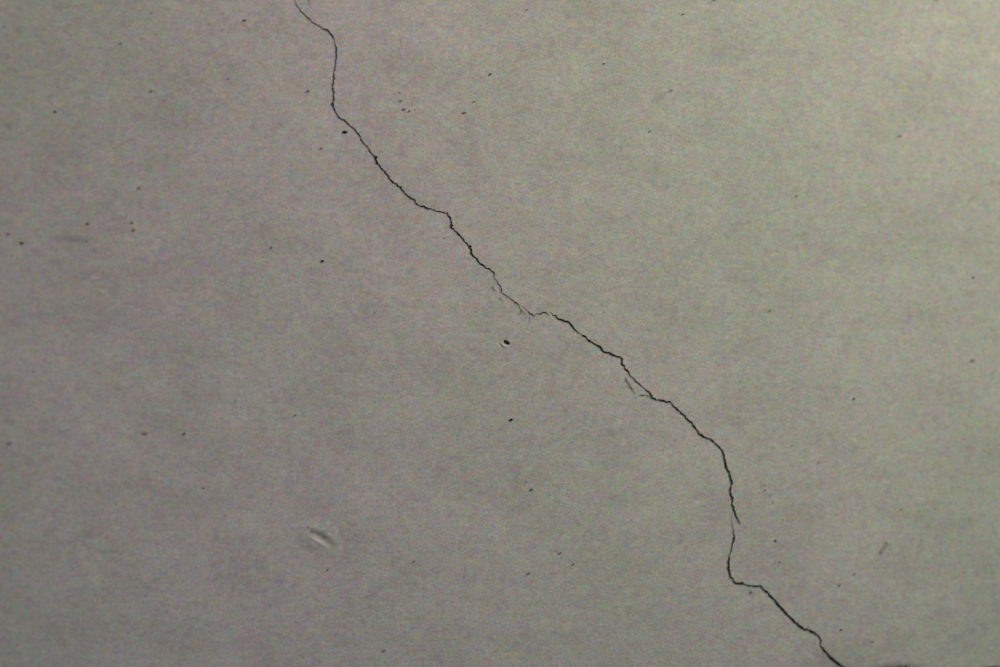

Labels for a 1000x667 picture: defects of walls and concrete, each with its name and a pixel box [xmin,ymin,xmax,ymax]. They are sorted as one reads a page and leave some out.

crack [295,0,844,667]